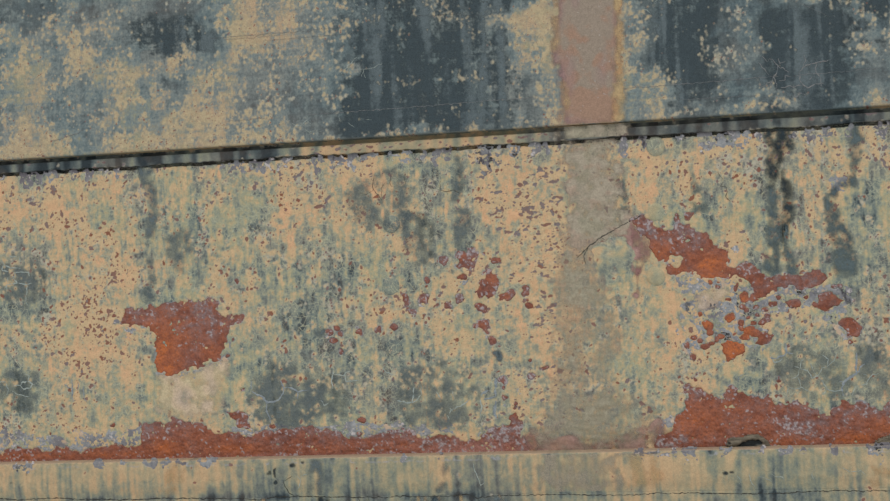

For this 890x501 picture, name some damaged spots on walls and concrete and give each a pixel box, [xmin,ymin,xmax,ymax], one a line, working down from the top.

corrosion [402,277,430,315]
corrosion [439,247,533,346]
crack [577,215,641,264]
corrosion [621,212,863,363]
leakage [764,129,797,275]
corrosion [0,297,890,462]
leakage [311,460,328,501]